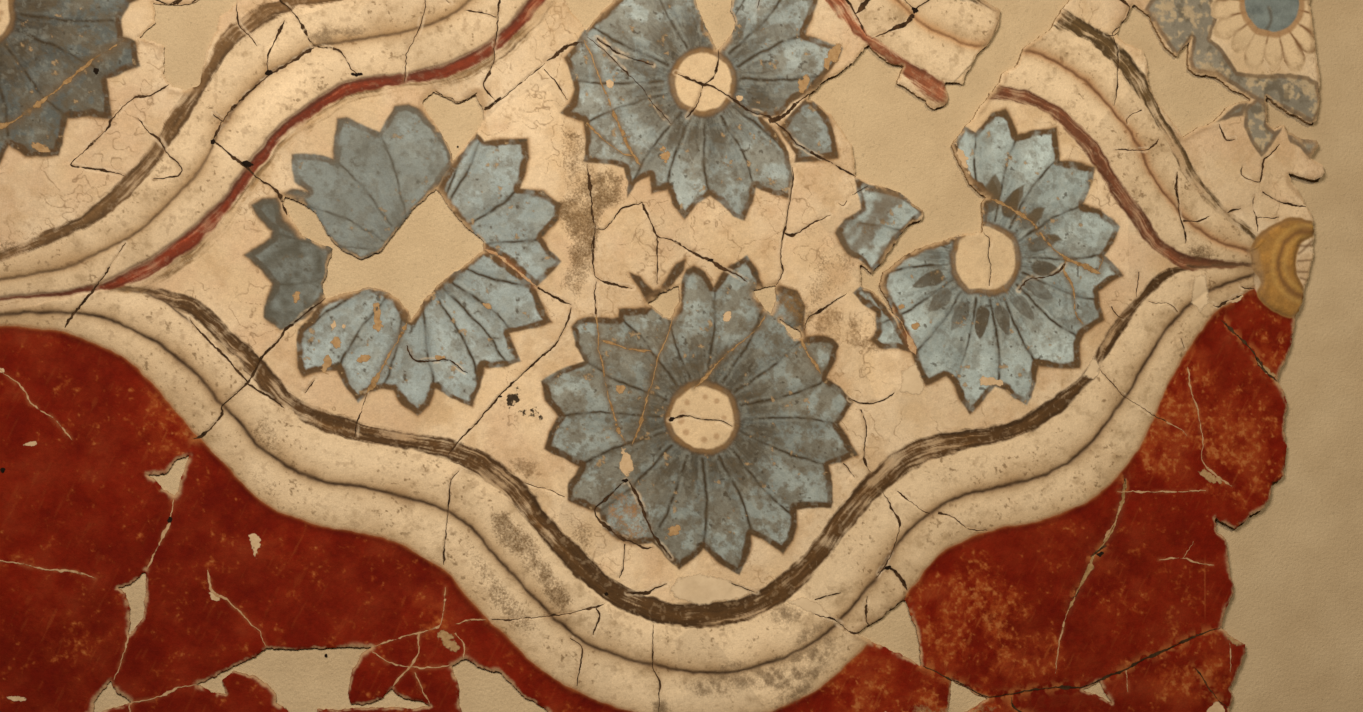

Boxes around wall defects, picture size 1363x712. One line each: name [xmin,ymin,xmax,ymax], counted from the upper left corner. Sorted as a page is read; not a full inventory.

crack [70,84,183,179]
flaking render [140,0,237,91]
crack [213,0,356,215]
flaking render [798,0,1068,313]
crack [190,298,326,439]
crack [372,0,867,712]
flaking render [149,455,189,495]
crack [815,393,986,634]
crack [923,272,1231,712]
flaking render [119,572,146,634]
flaking render [198,647,429,712]
flaking render [437,630,548,712]